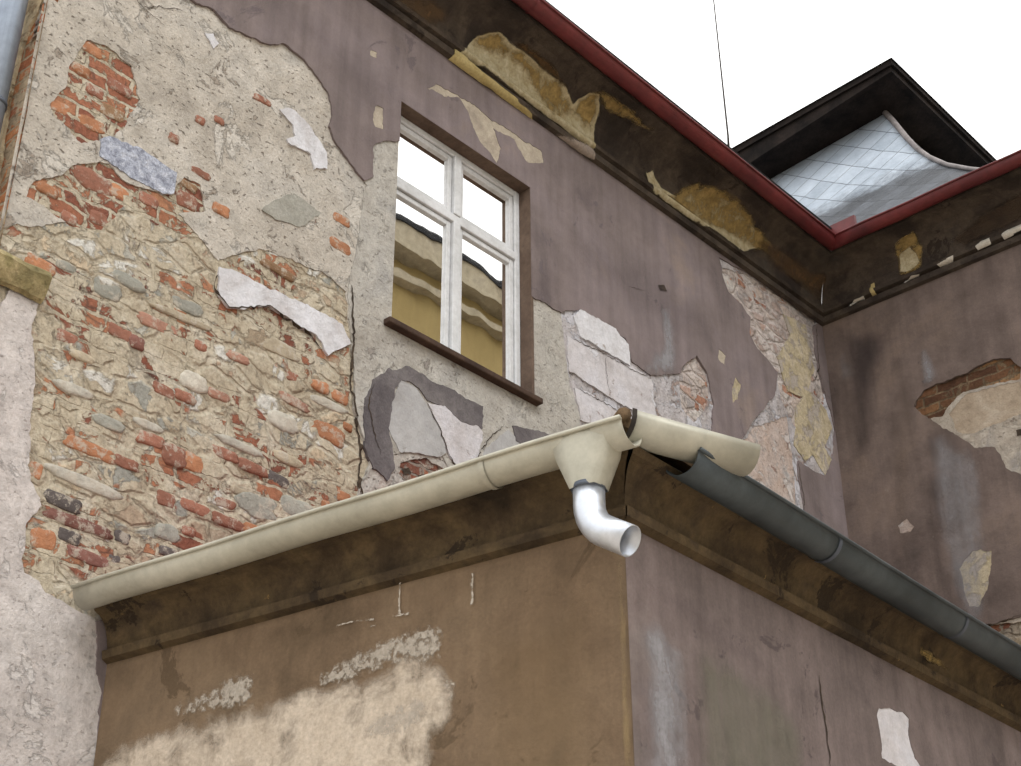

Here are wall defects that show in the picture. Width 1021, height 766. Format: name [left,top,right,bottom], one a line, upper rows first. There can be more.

peeling [646,171,769,252]
peeling [896,233,922,283]
peeling [1001,224,1021,240]
crack [214,275,322,351]
spalling [0,0,713,766]
crack [349,287,381,494]
peeling [720,259,848,538]
spalling [915,359,1021,474]
spalling [960,528,1013,607]
leakage [176,677,252,713]
leakage [321,630,440,684]
peeling [877,708,920,766]